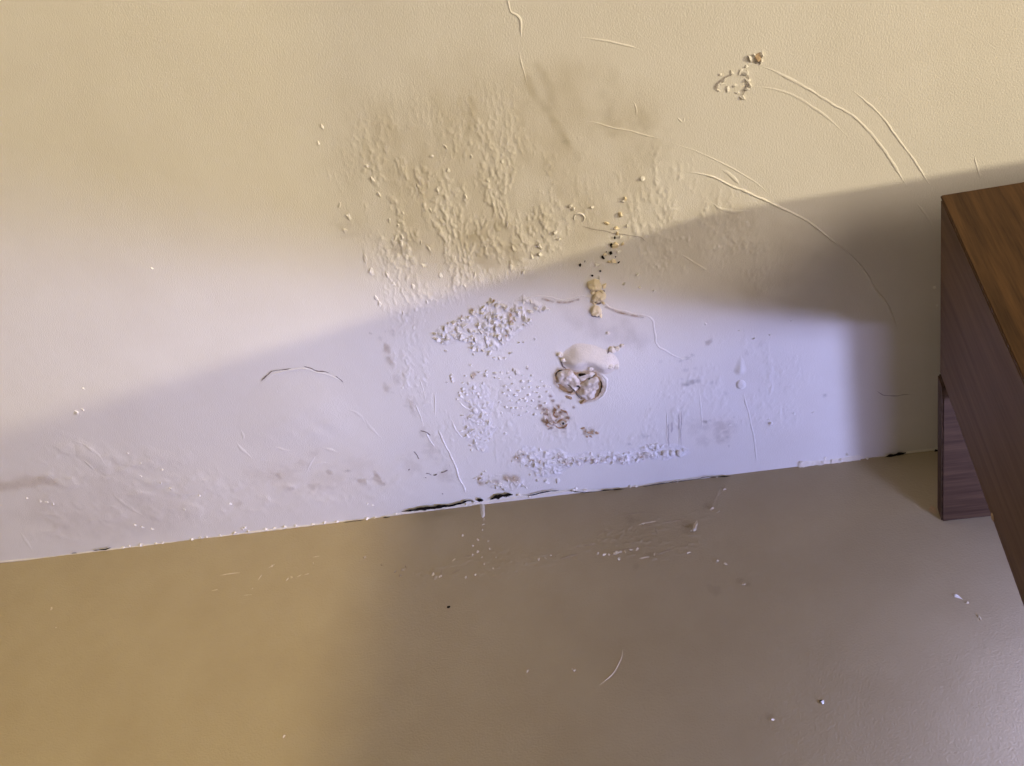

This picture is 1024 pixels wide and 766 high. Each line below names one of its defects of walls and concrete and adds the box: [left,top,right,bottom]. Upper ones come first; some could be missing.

spalling [714,52,764,100]
spalling [579,197,628,279]
crack [262,366,346,383]
peeling [432,294,692,453]
peeling [474,443,691,492]
crack [797,448,938,467]
crack [0,431,732,563]